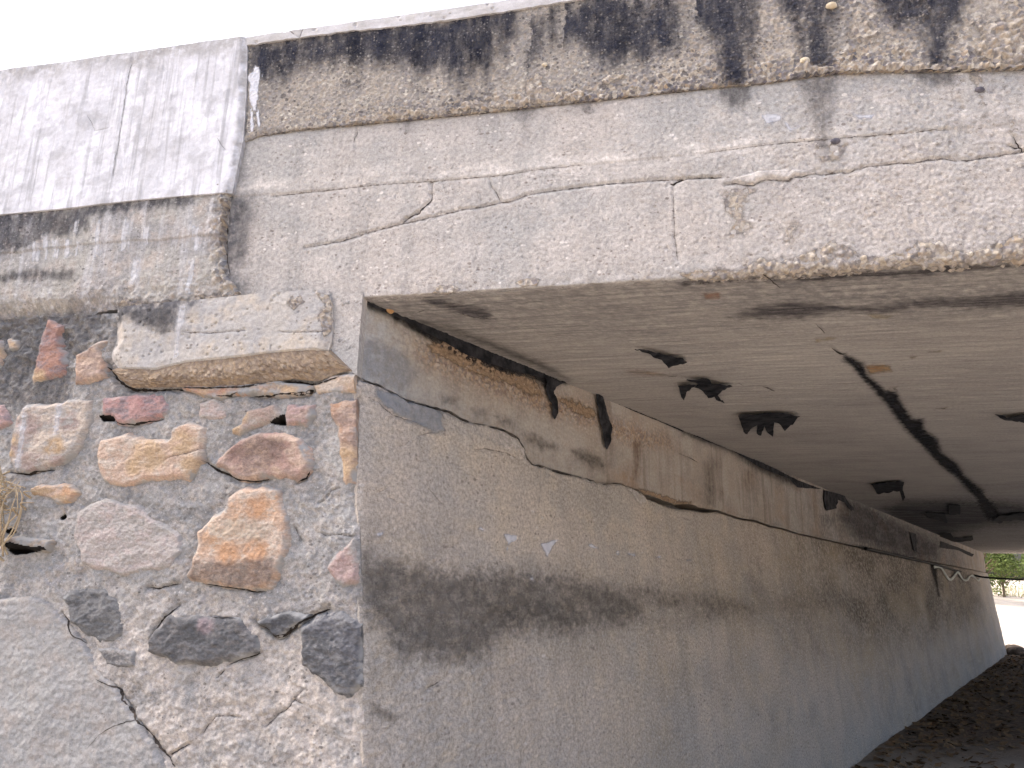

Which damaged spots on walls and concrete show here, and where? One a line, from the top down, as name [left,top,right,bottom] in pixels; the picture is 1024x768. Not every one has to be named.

damp [251,11,515,78]
damp [528,0,679,62]
damp [694,0,758,105]
crack [272,129,1024,260]
damp [0,197,187,282]
crack [363,381,571,476]
spalling [427,342,612,449]
peeling [635,349,687,368]
peeling [678,378,732,403]
peeling [738,413,800,437]
crack [816,324,999,519]
crack [90,680,233,766]